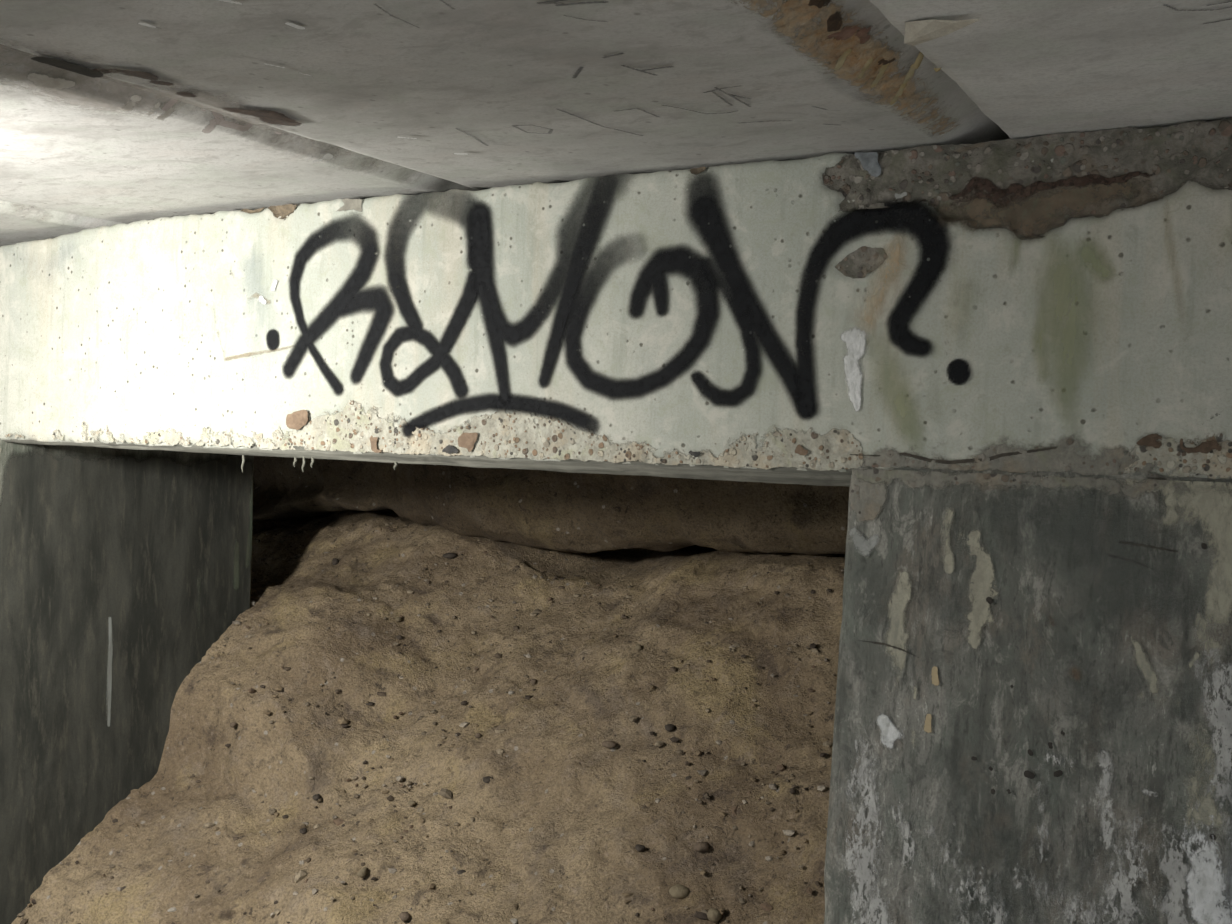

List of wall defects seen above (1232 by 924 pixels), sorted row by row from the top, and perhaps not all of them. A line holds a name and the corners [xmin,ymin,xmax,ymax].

corrosion [739,0,958,136]
spalling [822,119,1232,240]
spalling [52,400,864,471]
damp [844,714,915,924]
damp [931,844,1007,924]
damp [1014,649,1232,924]